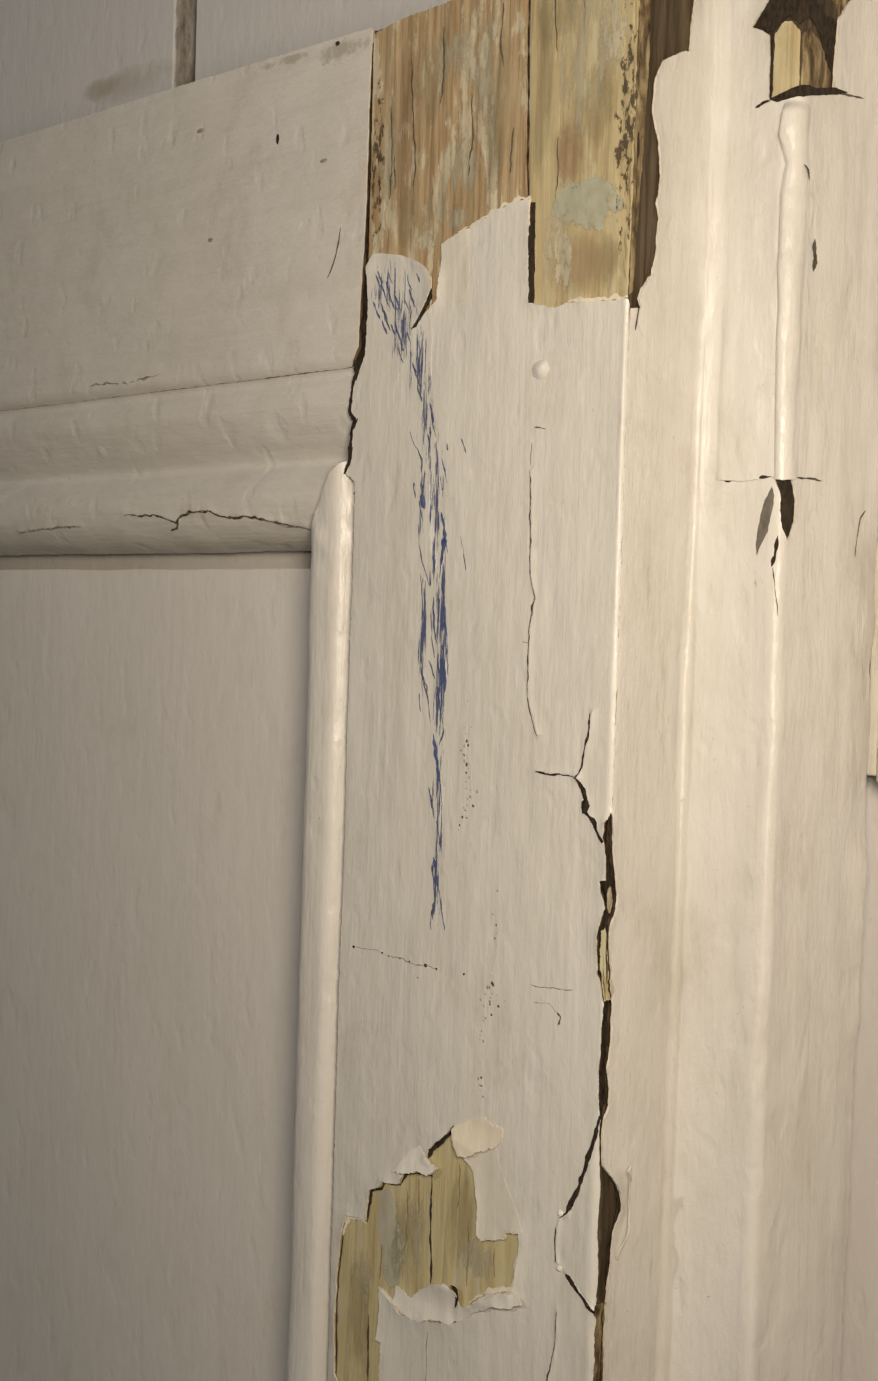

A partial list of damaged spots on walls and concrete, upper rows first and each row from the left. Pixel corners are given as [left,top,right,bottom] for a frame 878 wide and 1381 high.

peeling [366,0,694,337]
peeling [754,0,864,108]
crack [21,525,80,533]
crack [125,510,310,531]
crack [522,427,545,736]
peeling [334,889,522,1381]
crack [530,714,615,1381]